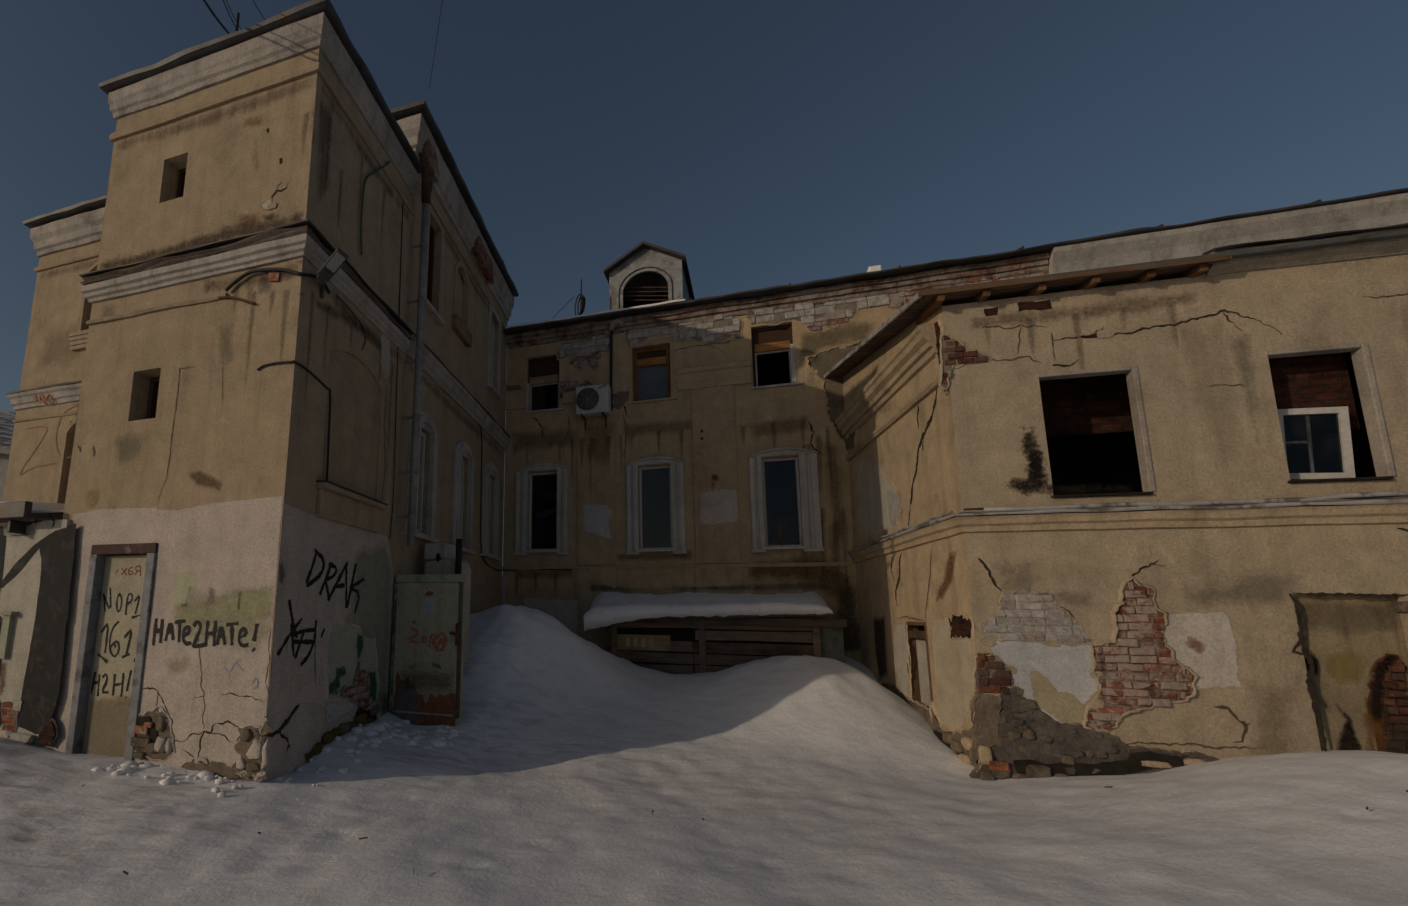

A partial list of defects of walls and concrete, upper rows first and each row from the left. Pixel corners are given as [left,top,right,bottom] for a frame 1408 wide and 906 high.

crack [157,367,188,502]
peeling [556,267,1052,539]
crack [891,388,937,622]
water stain [1011,428,1131,494]
crack [982,309,1282,367]
crack [1362,292,1408,300]
spalling [130,704,274,783]
crack [142,604,300,760]
flaking render [947,576,1199,779]
crack [1127,705,1267,750]
crack [1289,592,1408,752]